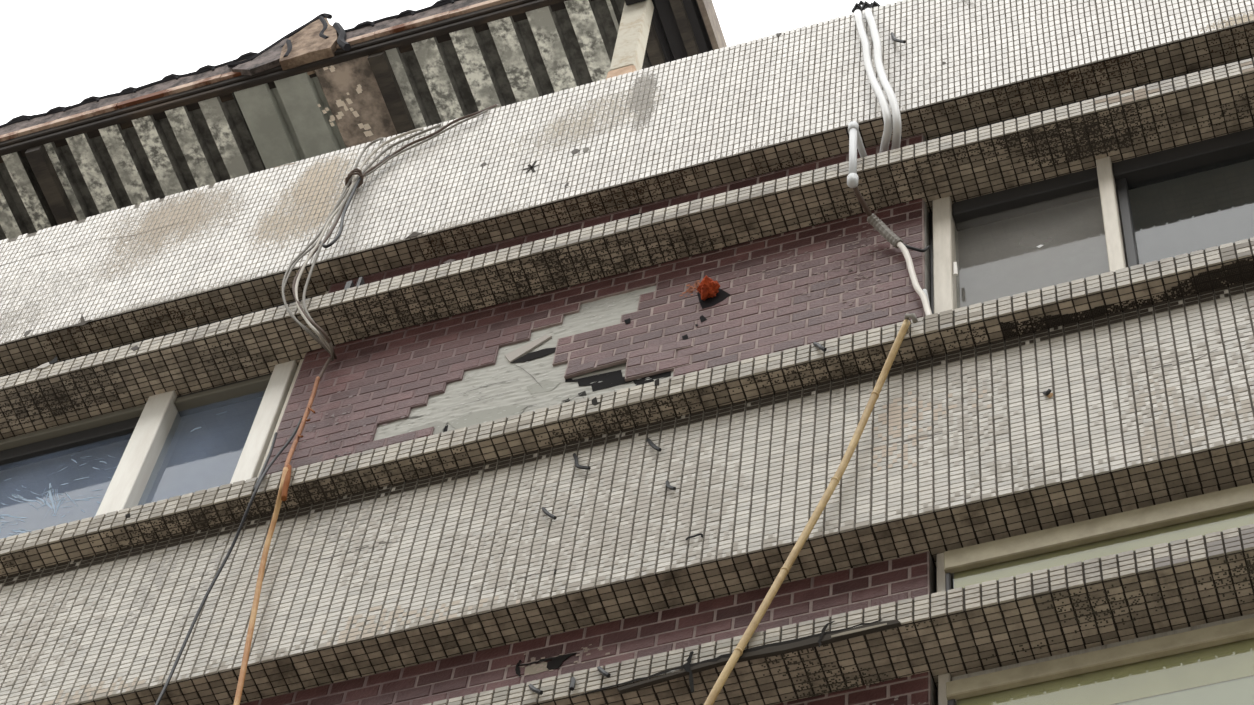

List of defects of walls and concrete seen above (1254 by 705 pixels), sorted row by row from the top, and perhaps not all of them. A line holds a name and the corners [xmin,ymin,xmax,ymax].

damp [892,23,1254,134]
damp [0,185,360,351]
damp [410,163,713,262]
spalling [373,285,674,441]